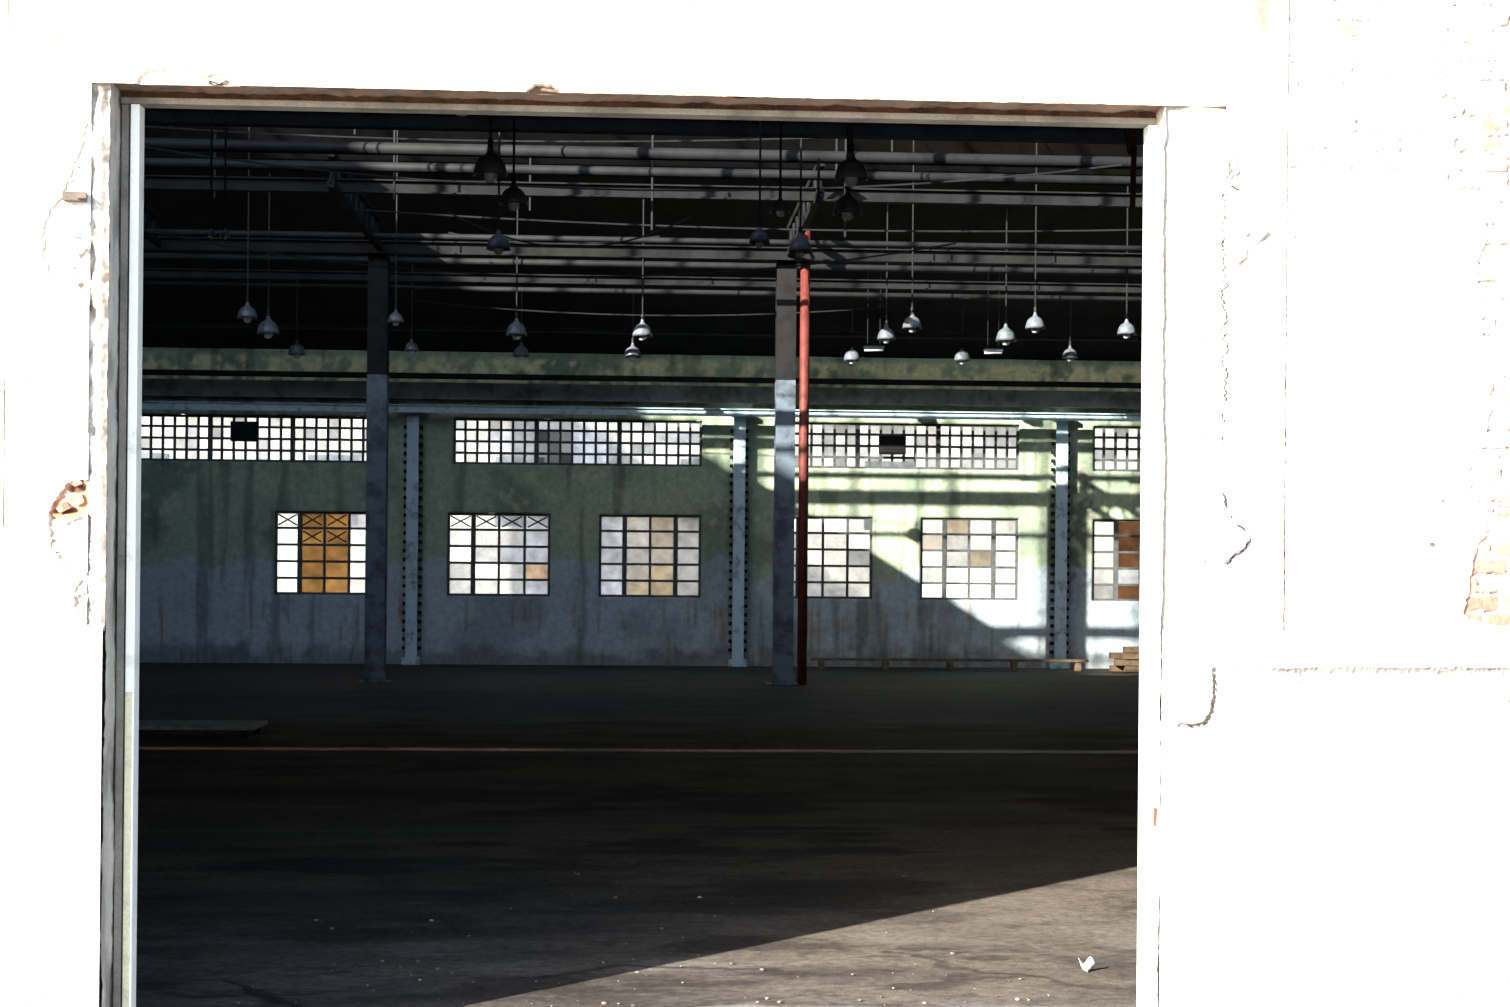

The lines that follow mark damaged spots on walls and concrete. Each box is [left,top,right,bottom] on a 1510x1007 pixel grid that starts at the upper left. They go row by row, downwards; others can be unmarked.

peeling [43,125,91,306]
peeling [4,382,89,622]
peeling [1222,175,1510,632]
crack [1181,671,1216,728]